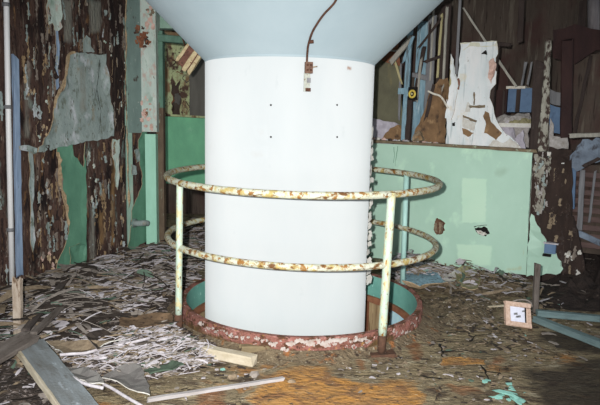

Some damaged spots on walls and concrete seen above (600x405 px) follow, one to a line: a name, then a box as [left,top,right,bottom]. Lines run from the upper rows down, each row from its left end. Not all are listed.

peeling [19,0,155,270]
peeling [164,30,190,115]
peeling [483,111,502,140]
peeling [390,152,582,300]